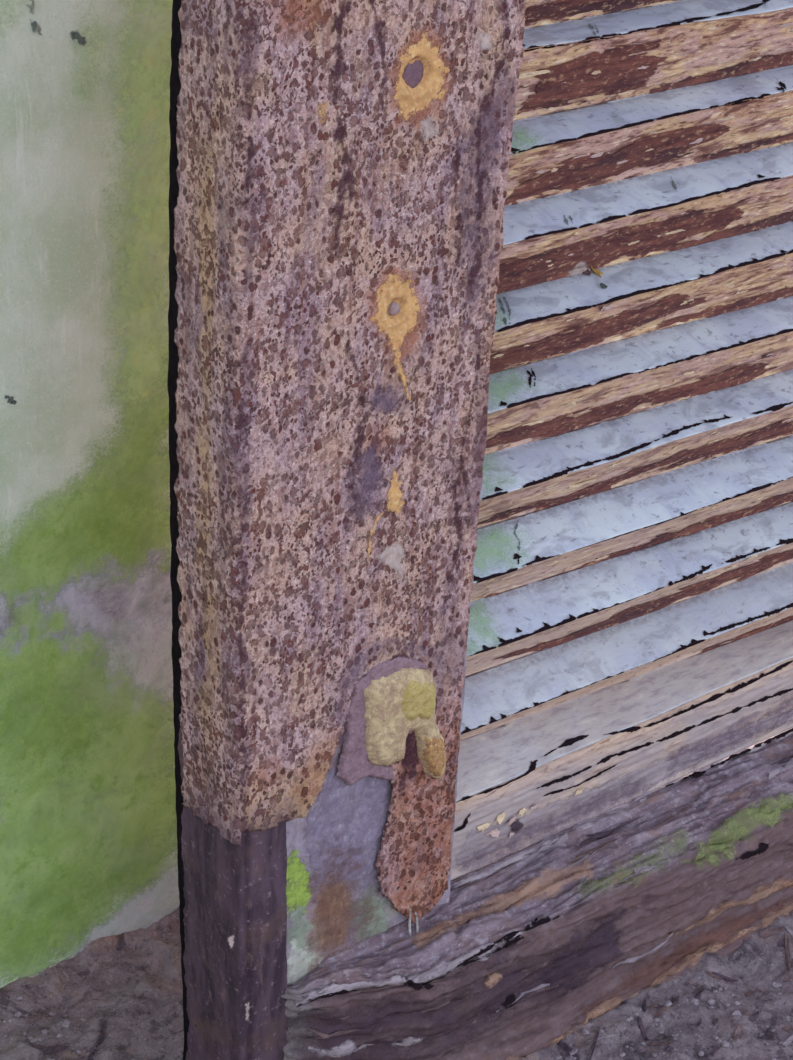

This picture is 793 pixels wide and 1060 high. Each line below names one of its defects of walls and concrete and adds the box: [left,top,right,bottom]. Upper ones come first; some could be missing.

peeling [517,22,793,115]
peeling [504,115,793,205]
peeling [497,200,793,294]
peeling [489,281,793,375]
peeling [486,353,776,448]
corrosion [174,0,593,949]
leakage [0,550,173,700]
crack [461,603,793,734]
crack [454,661,793,832]
crack [735,843,770,861]
leakage [29,869,179,978]
crack [296,916,560,1008]